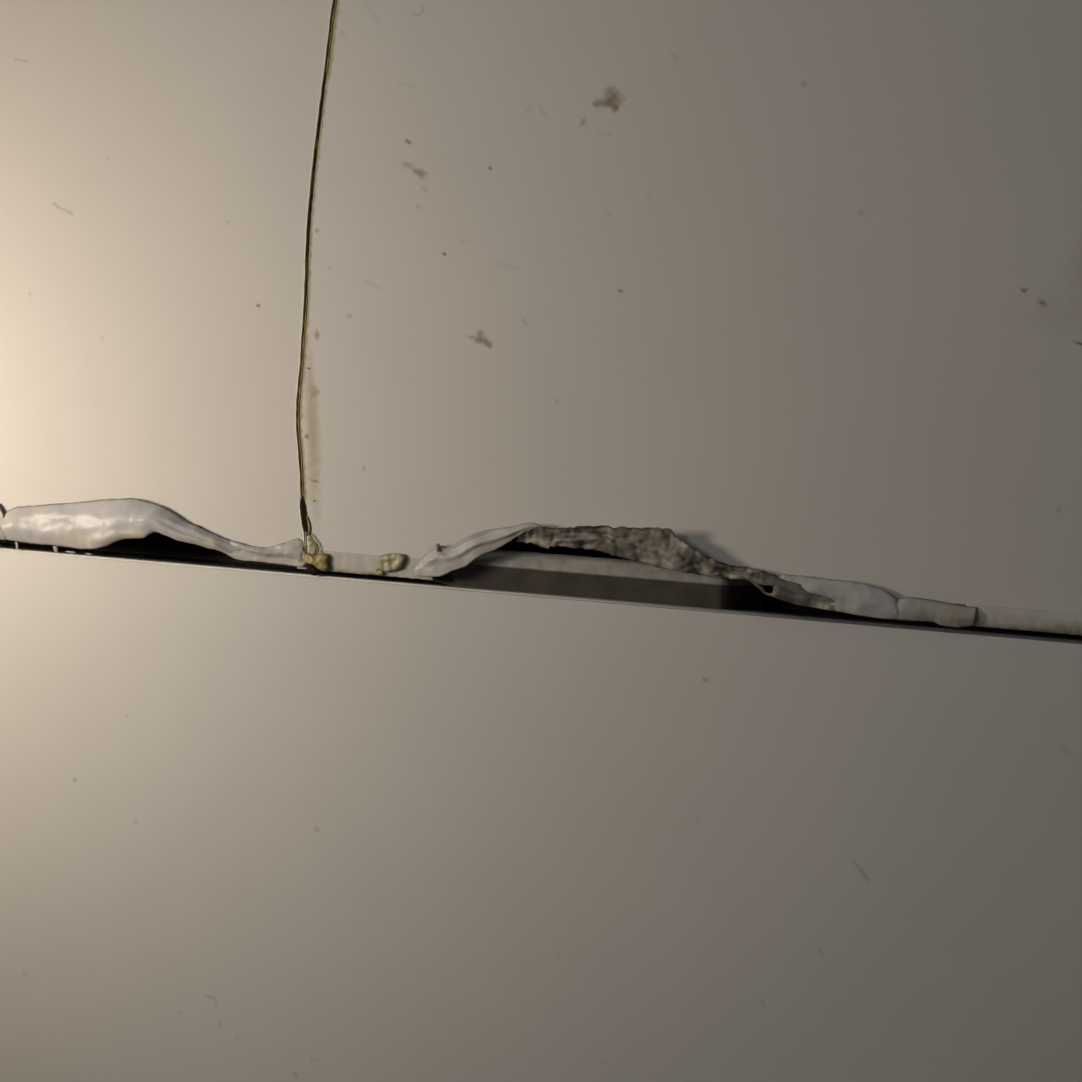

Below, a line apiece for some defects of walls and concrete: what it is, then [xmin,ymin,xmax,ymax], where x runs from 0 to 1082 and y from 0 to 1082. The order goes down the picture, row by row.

crack [295,0,338,555]
peeling [415,522,977,628]